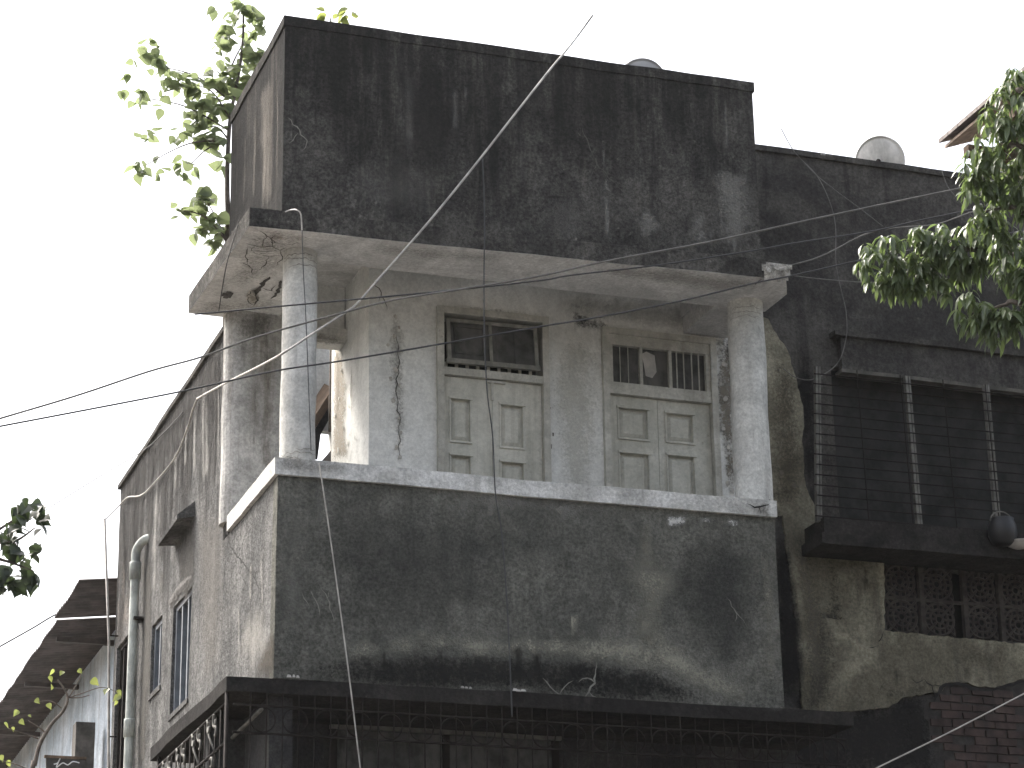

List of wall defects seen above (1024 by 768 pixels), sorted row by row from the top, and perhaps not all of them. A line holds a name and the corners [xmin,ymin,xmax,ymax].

spalling [222,277,282,305]
crack [231,220,317,274]
damp [317,530,738,702]
spalling [923,680,1024,768]